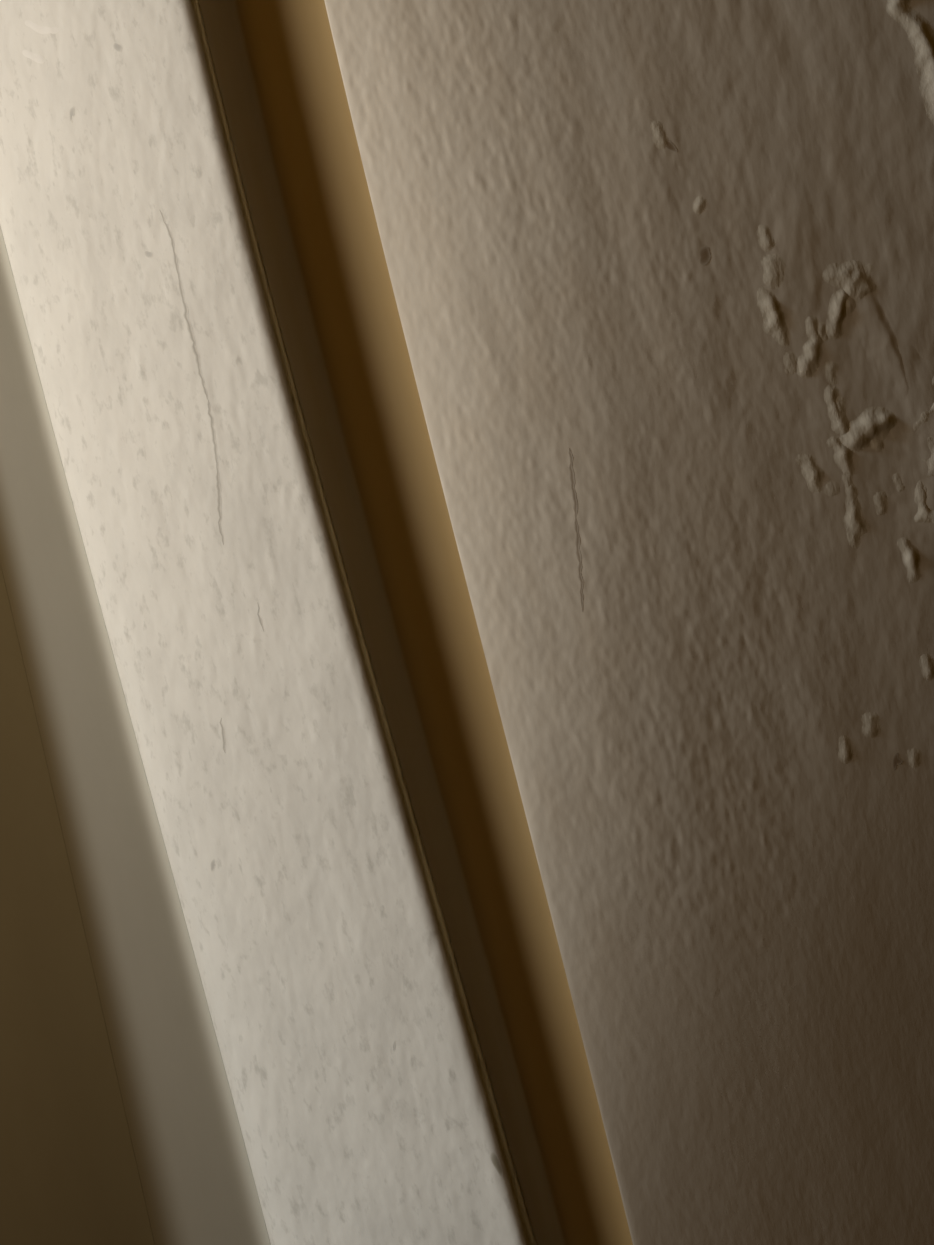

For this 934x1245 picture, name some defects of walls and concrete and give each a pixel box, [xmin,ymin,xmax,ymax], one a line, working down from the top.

peeling [885,0,934,124]
crack [159,209,224,545]